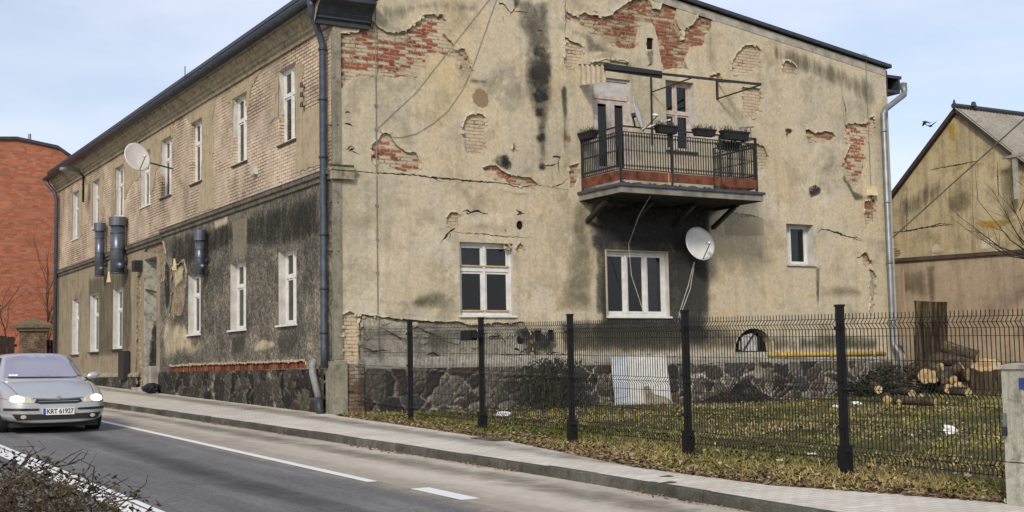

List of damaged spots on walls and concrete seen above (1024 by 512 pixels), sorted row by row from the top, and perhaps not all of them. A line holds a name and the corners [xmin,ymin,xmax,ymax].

flaking render [341,11,475,88]
flaking render [563,0,715,70]
damp [473,89,489,108]
damp [530,47,550,141]
flaking render [368,129,422,174]
crack [345,111,568,241]
flaking render [460,110,538,189]
flaking render [805,114,877,188]
damp [246,204,315,244]
crack [818,229,873,265]
flaking render [144,241,307,372]
peeling [341,309,534,363]